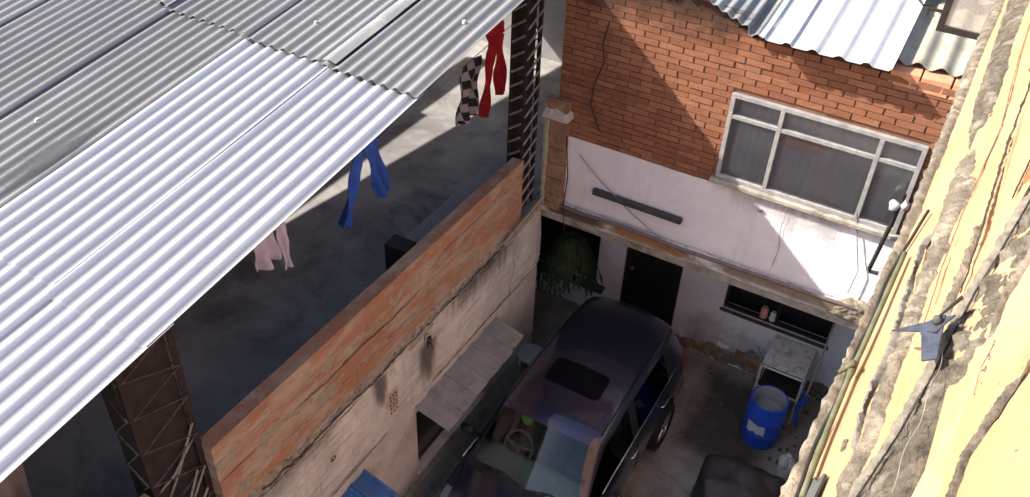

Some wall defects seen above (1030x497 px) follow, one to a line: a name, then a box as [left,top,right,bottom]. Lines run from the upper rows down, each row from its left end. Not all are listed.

damp [376,374,387,403]
spalling [248,225,516,497]
peeling [676,327,767,377]
spalling [779,0,1030,497]